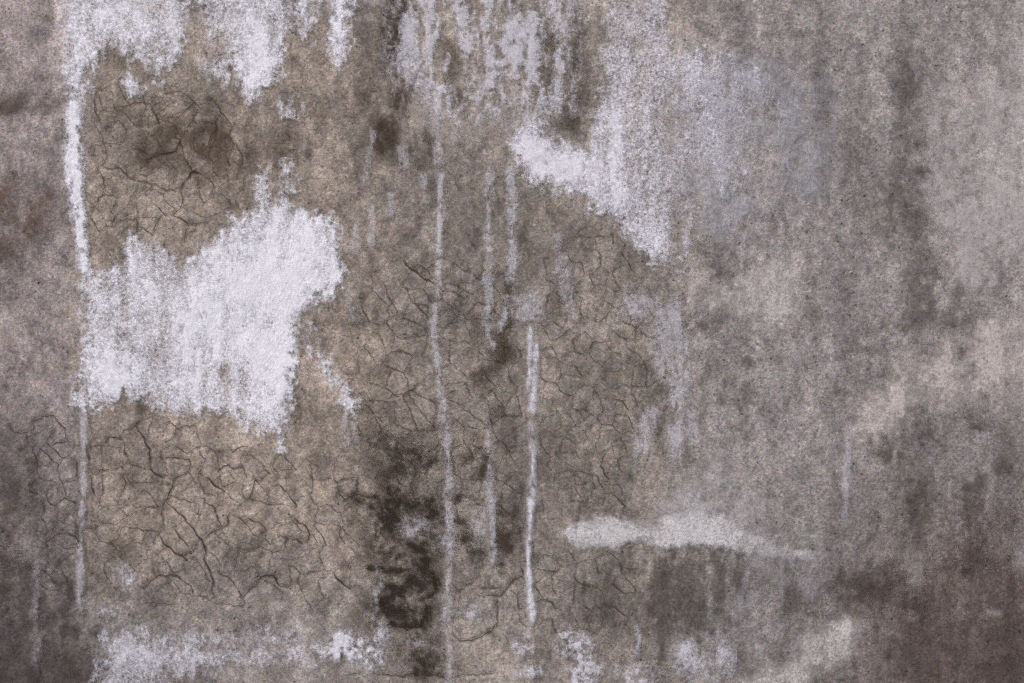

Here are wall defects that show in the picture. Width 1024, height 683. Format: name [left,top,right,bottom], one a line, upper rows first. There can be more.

damp [64,101,89,274]
crack [90,77,244,238]
damp [99,485,444,683]
crack [12,228,661,641]
damp [454,518,483,560]
damp [468,455,488,476]
damp [472,241,516,385]
damp [495,447,536,622]
damp [527,328,539,413]